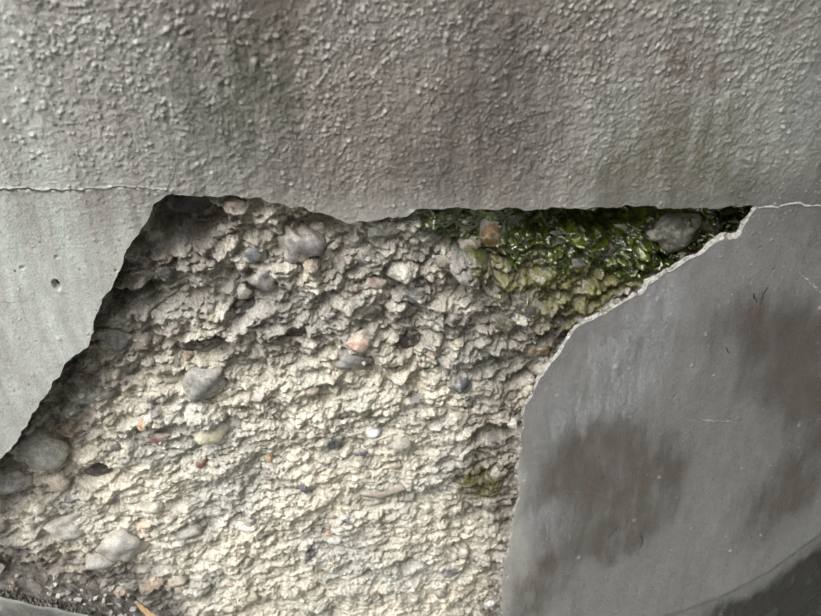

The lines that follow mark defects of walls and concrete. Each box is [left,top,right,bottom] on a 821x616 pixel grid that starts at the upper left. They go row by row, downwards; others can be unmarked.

crack [0,167,176,192]
spalling [0,194,757,616]